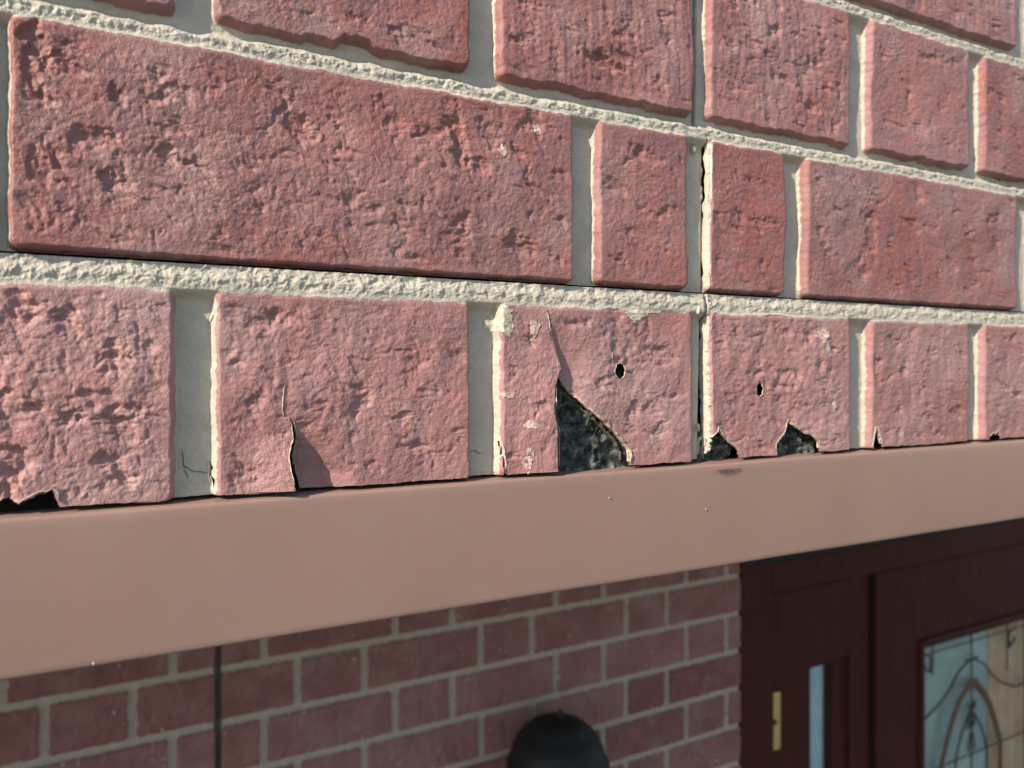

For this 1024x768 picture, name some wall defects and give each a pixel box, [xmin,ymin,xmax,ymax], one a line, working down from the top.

peeling [484,302,514,337]
peeling [529,319,541,337]
spalling [612,352,625,379]
crack [696,345,712,454]
crack [282,386,309,490]
spalling [520,378,633,474]
spalling [695,427,741,462]
spalling [761,418,820,457]